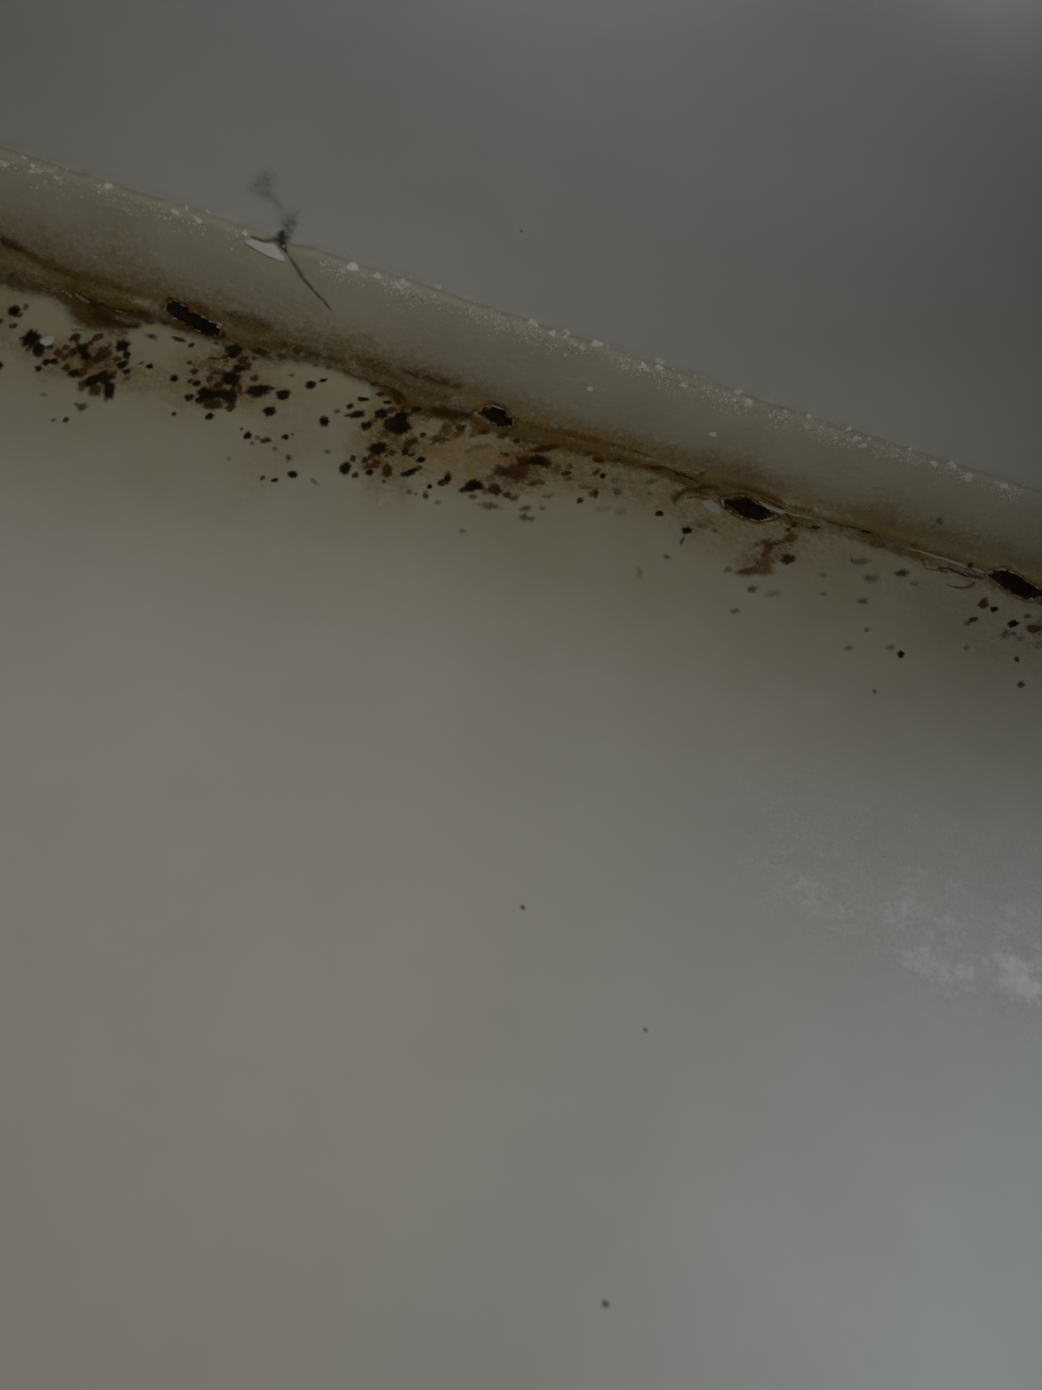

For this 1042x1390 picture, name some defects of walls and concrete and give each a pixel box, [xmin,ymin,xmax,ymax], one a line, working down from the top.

crack [244,231,329,307]
water stain [0,304,153,422]
water stain [146,321,302,420]
water stain [240,428,297,482]
water stain [339,383,616,520]
water stain [737,522,820,591]
water stain [966,598,998,625]
water stain [1003,602,1042,639]